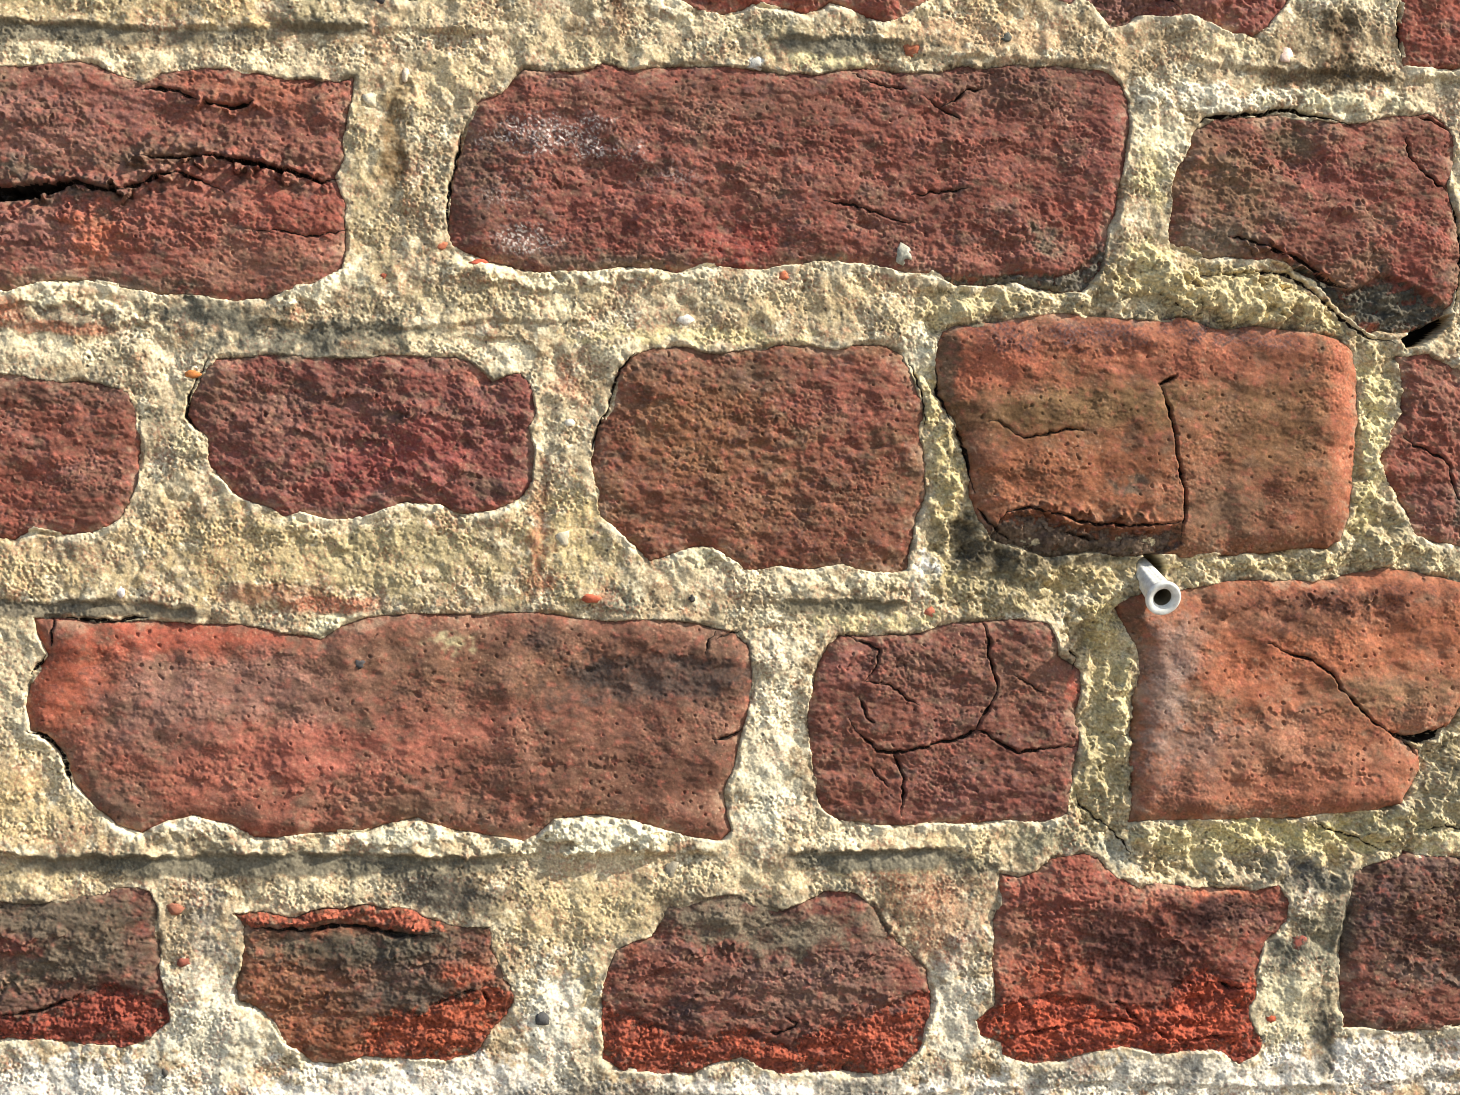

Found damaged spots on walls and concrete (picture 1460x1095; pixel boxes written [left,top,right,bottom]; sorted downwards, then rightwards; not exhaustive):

crack [141,86,253,110]
crack [0,154,337,199]
crack [1405,117,1460,311]
crack [1201,236,1396,344]
crack [908,360,1185,541]
crack [845,622,1075,816]
crack [1268,643,1444,755]
spalling [237,905,446,932]
spalling [0,982,169,1047]
spalling [350,978,513,1061]
spalling [602,989,931,1075]
spalling [977,961,1276,1064]